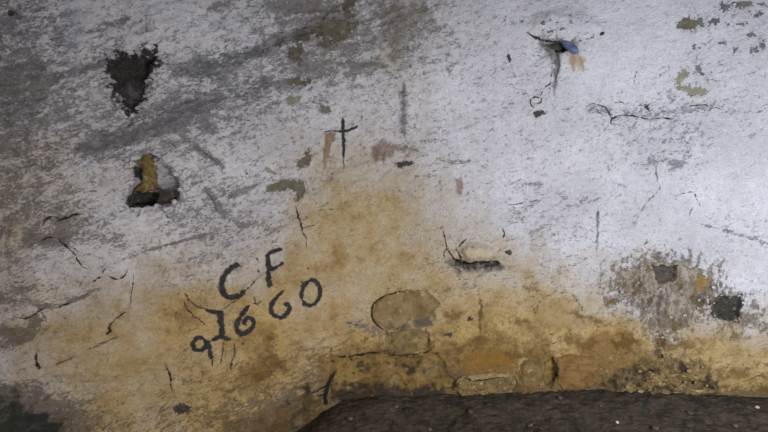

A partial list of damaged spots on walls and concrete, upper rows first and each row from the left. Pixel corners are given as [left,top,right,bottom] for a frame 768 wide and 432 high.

peeling [676,0,768,54]
spalling [99,44,164,117]
peeling [675,65,712,98]
crack [587,101,670,121]
spalling [123,153,184,210]
peeling [612,252,747,339]
water stain [600,241,768,357]
water stain [331,381,444,401]